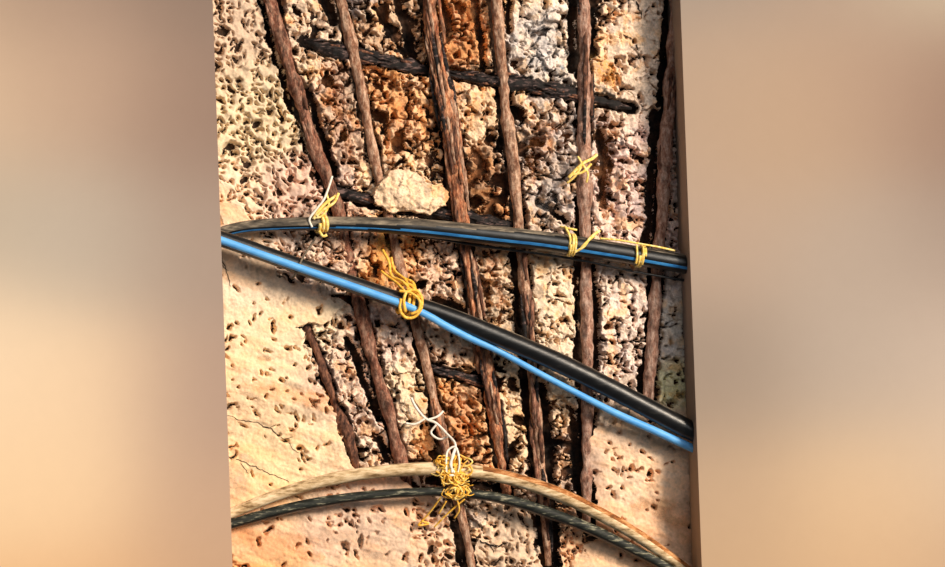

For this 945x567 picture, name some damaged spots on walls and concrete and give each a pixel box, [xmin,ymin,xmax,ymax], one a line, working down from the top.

spalling [213,0,680,253]
spalling [274,267,630,505]
spalling [259,230,686,410]
spalling [399,475,596,567]